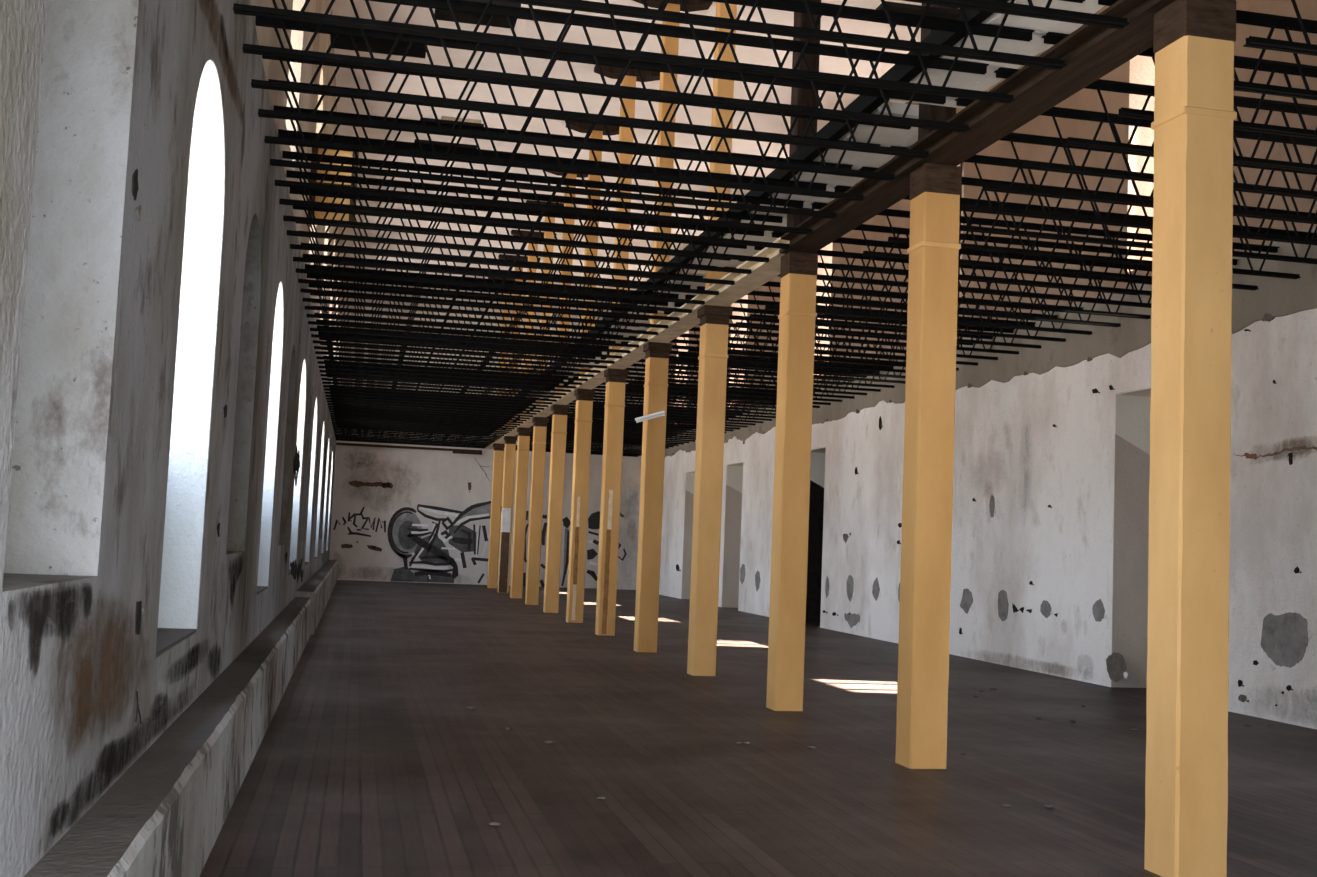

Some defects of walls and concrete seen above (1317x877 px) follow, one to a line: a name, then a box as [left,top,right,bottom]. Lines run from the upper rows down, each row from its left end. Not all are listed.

crack [1233,446,1317,465]
water stain [9,586,92,673]
water stain [171,644,220,678]
flaking render [959,589,974,634]
flaking render [998,590,1058,621]
flaking render [1092,599,1107,622]
flaking render [1253,612,1313,670]
water stain [51,694,188,834]